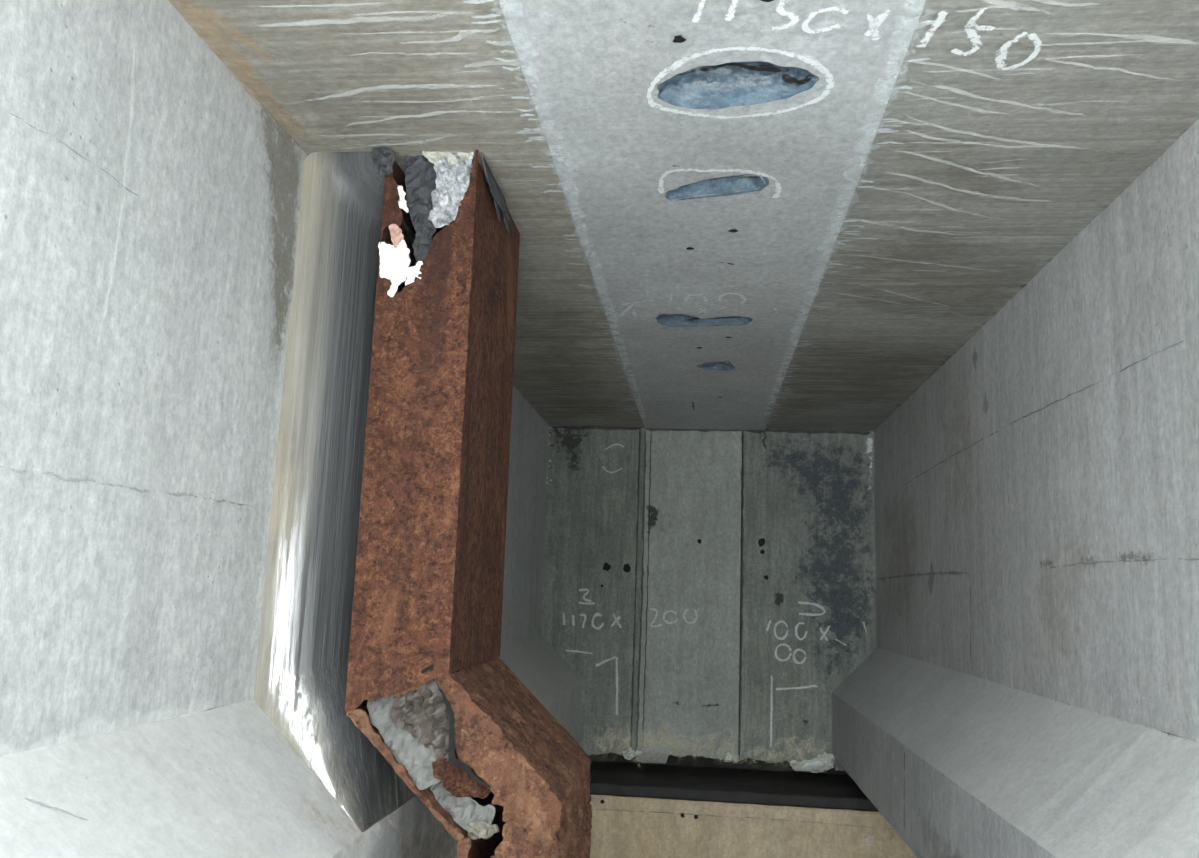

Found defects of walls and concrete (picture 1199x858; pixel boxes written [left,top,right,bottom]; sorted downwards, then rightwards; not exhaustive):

damp [920,0,1096,33]
damp [893,32,1199,115]
crack [10,113,138,196]
peeling [398,185,409,213]
peeling [378,224,423,297]
damp [760,117,1087,682]
crack [11,469,252,507]
crack [591,753,905,829]